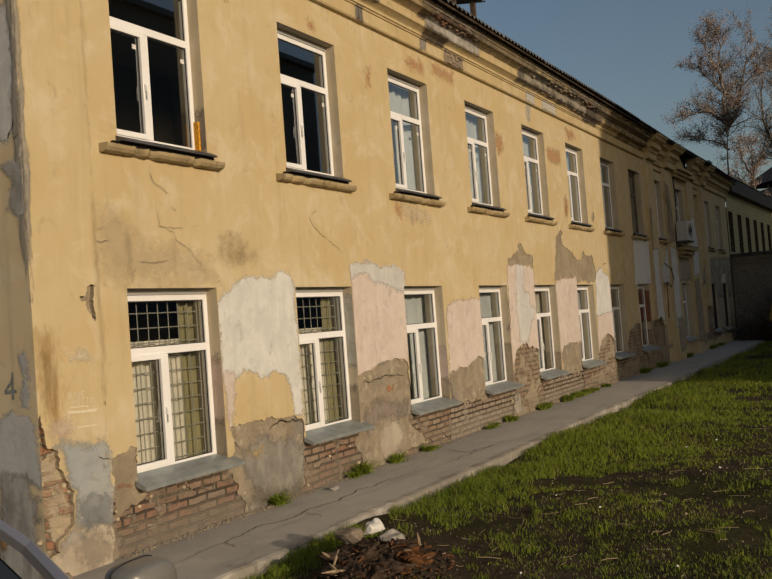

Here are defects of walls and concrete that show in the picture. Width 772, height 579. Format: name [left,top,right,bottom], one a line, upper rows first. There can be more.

peeling [0,0,33,272]
flaking render [507,243,533,268]
flaking render [554,229,596,284]
spalling [37,416,75,558]
flaking render [111,290,670,560]